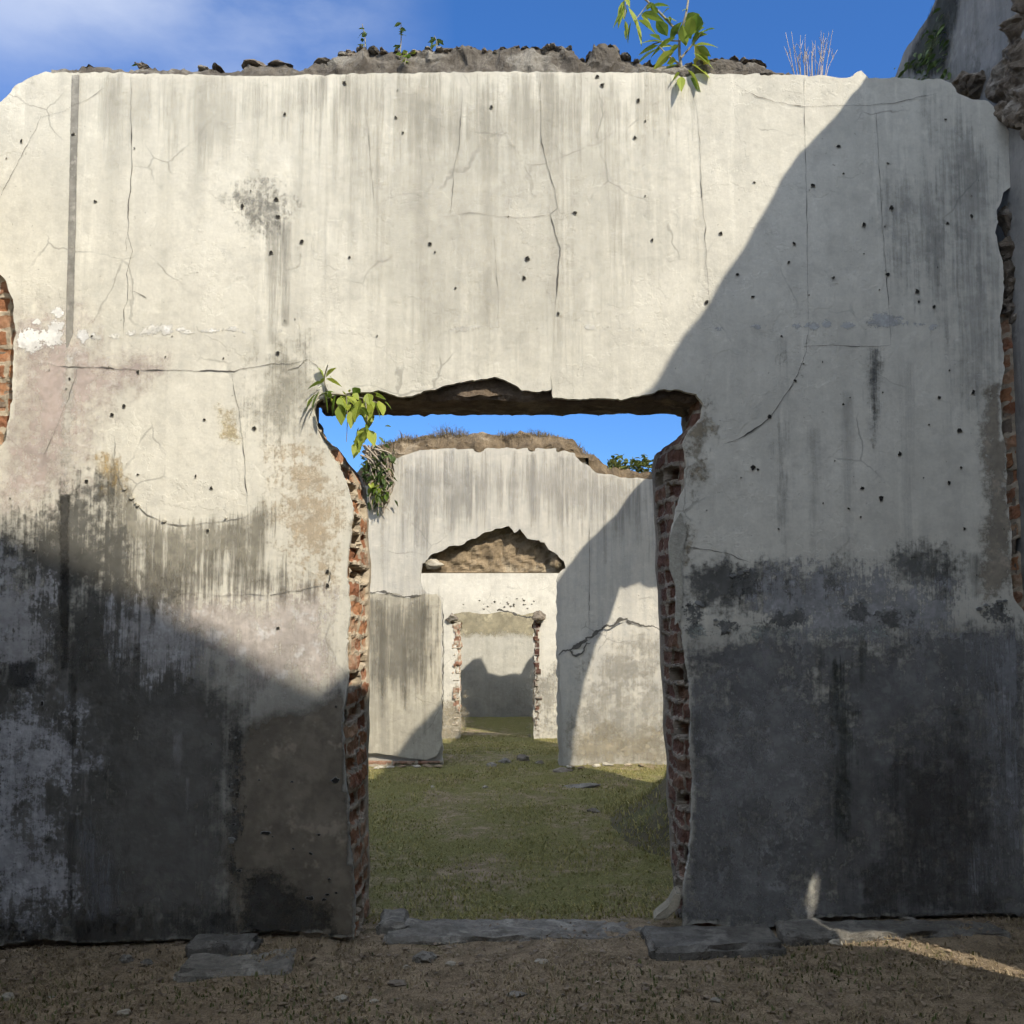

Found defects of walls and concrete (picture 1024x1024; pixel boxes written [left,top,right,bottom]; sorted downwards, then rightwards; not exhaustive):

crack [444,93,561,328]
spalling [0,275,16,446]
crack [30,361,163,454]
leakage [0,472,354,942]
crack [112,359,318,526]
spalling [317,419,371,941]
spalling [422,526,565,573]
crack [559,530,659,657]
spalling [652,401,741,926]
leakage [686,415,719,480]
leakage [683,525,1024,928]
spalling [976,200,1024,624]